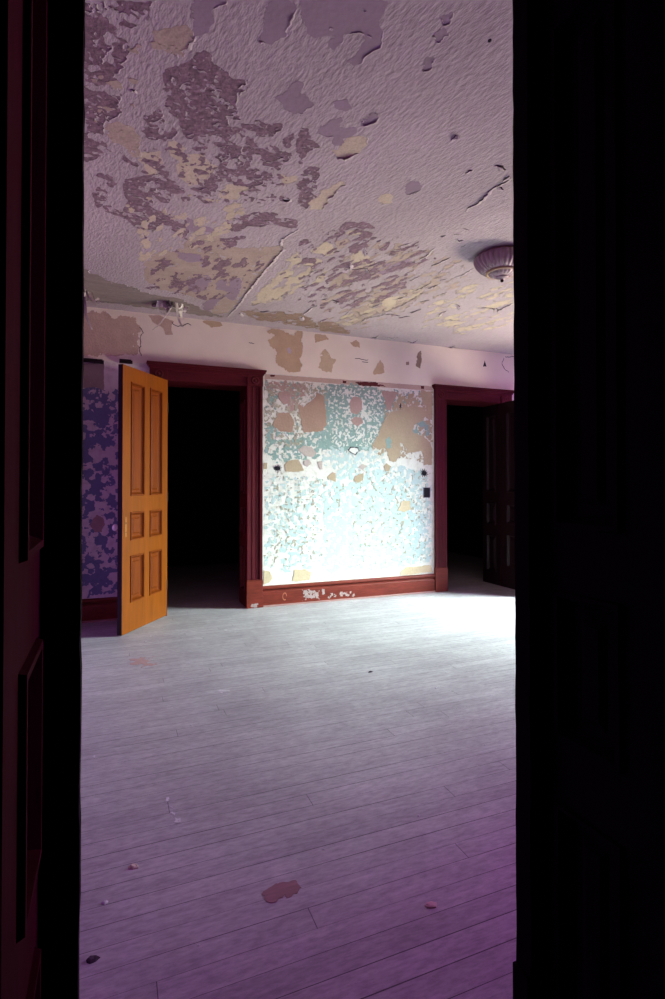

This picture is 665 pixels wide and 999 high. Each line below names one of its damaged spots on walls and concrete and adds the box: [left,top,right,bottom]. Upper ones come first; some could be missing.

peeling [82,0,514,600]
crack [465,176,513,212]